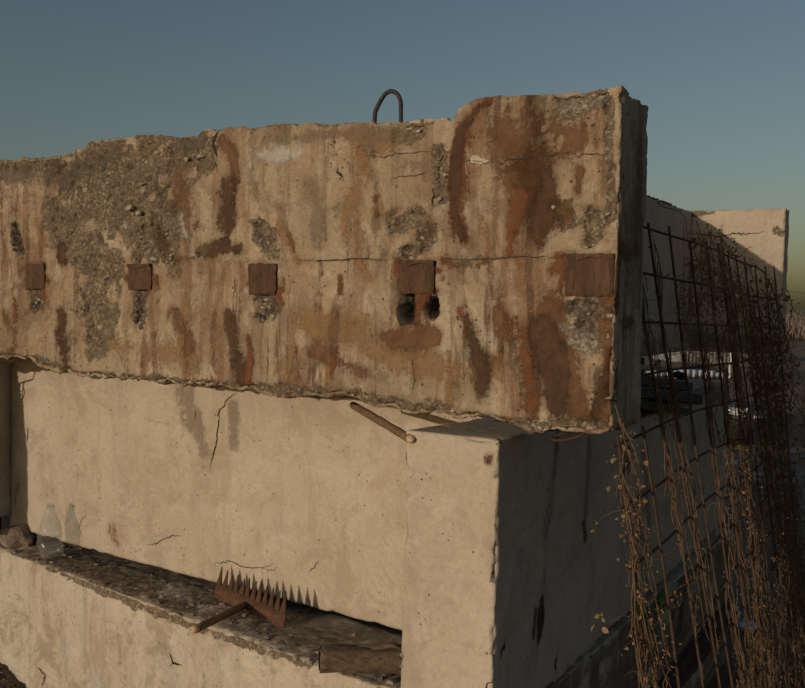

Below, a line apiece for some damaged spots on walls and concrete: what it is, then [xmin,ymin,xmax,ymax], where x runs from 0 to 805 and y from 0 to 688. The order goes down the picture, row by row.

rust [34,218,69,267]
rust [54,306,87,373]
spalling [0,130,242,388]
spalling [248,216,280,260]
rust [328,122,400,281]
spalling [396,293,440,326]
rust [271,230,639,427]
rust [446,96,594,257]
spalling [551,92,618,248]
crack [691,221,764,253]
crack [210,393,235,464]
spalling [610,223,805,688]